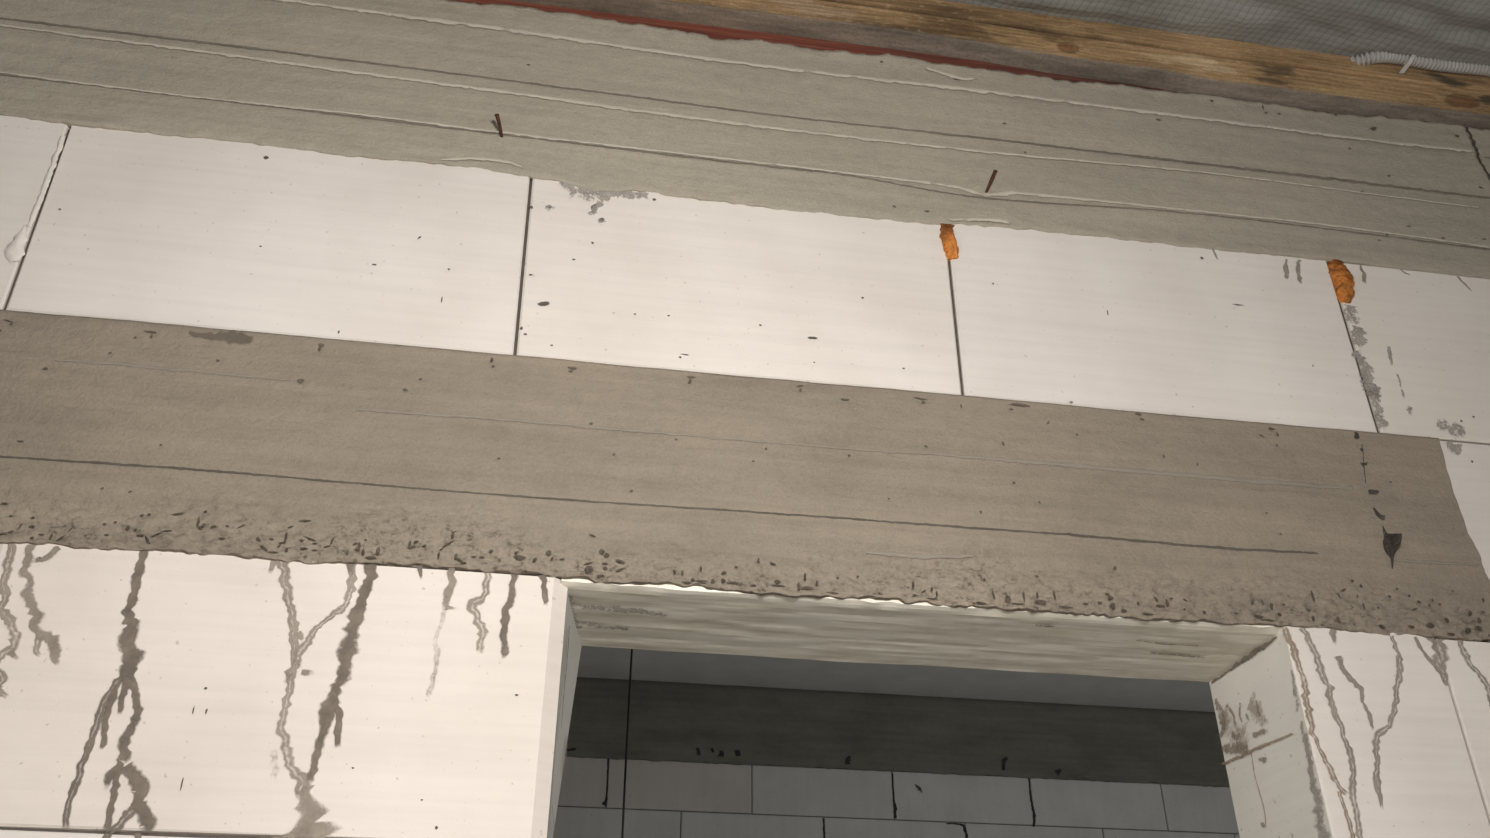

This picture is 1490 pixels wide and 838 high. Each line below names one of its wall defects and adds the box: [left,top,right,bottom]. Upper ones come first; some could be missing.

crack [1465,127,1490,180]
crack [1354,432,1385,536]
damp [0,544,61,696]
damp [62,551,157,838]
damp [269,560,378,838]
damp [443,568,518,656]
damp [539,575,548,604]
damp [1282,627,1403,838]
damp [1414,637,1490,706]